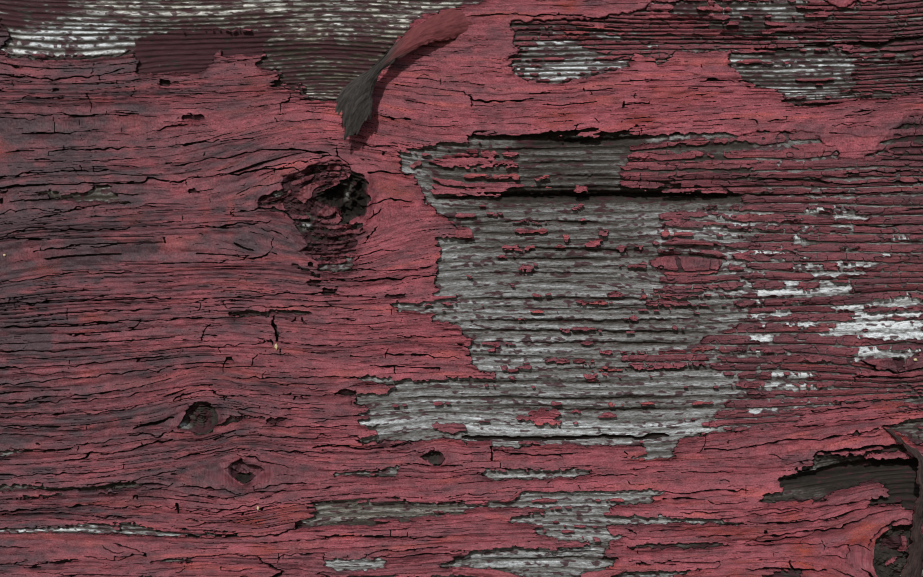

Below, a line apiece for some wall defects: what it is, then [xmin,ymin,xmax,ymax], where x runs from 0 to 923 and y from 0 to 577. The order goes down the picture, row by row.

crack [0,54,409,263]
peeling [0,0,491,140]
crack [463,88,598,136]
crack [624,77,659,136]
peeling [507,0,923,108]
peeling [332,118,923,510]
crack [0,197,669,577]
peeling [0,480,143,499]
peeling [0,521,236,539]
peeling [151,557,193,565]
peeling [299,467,747,577]